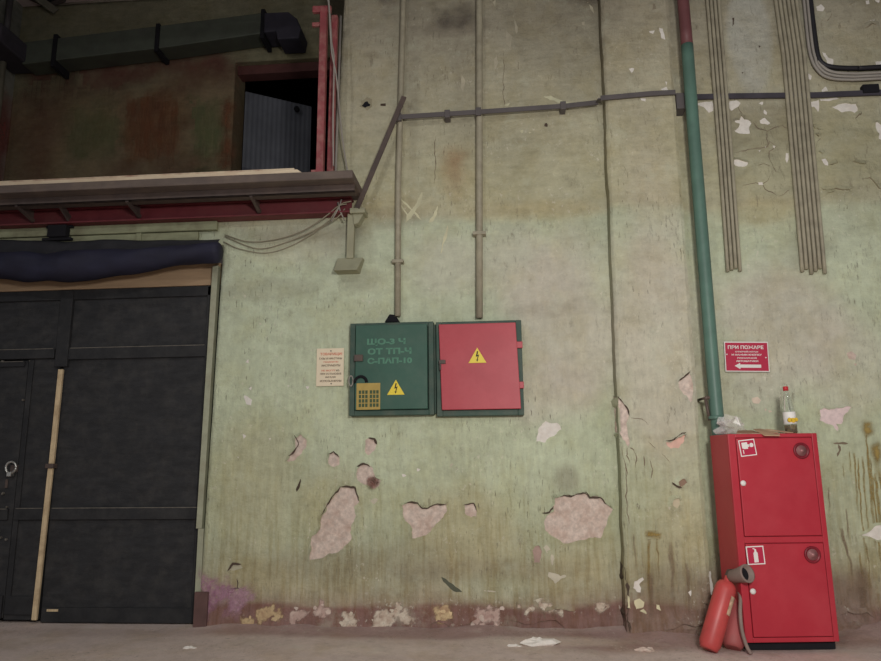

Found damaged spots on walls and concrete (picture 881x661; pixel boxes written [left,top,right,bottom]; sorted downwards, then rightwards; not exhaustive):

peeling [811,87,861,115]
crack [736,107,789,195]
crack [820,158,881,205]
flaking render [306,435,384,564]
flaking render [399,499,450,541]
flaking render [541,490,615,583]
peeling [240,599,331,625]
peeling [339,611,357,627]
peeling [372,602,414,627]
peeling [433,605,453,624]
peeling [471,605,504,626]
peeling [517,598,563,617]